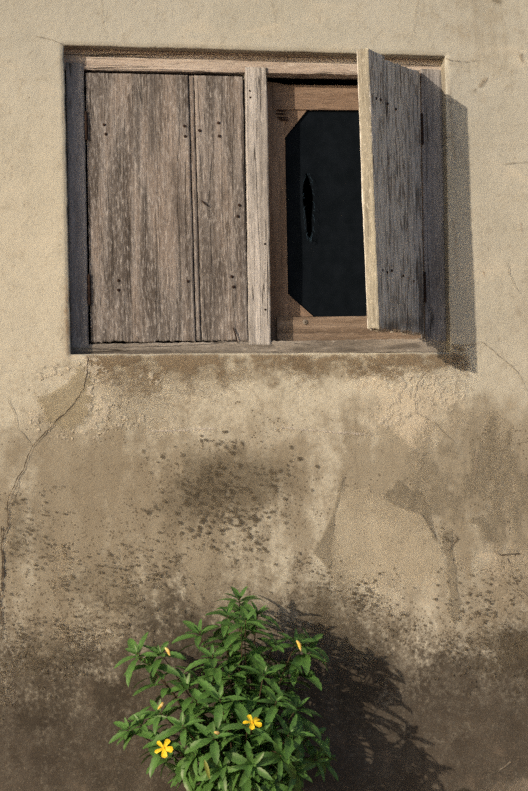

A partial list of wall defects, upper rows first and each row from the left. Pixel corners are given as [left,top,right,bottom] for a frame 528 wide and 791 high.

damp [86,346,469,429]
crack [0,357,89,659]
damp [0,430,302,699]
damp [270,476,431,691]
damp [433,523,528,704]